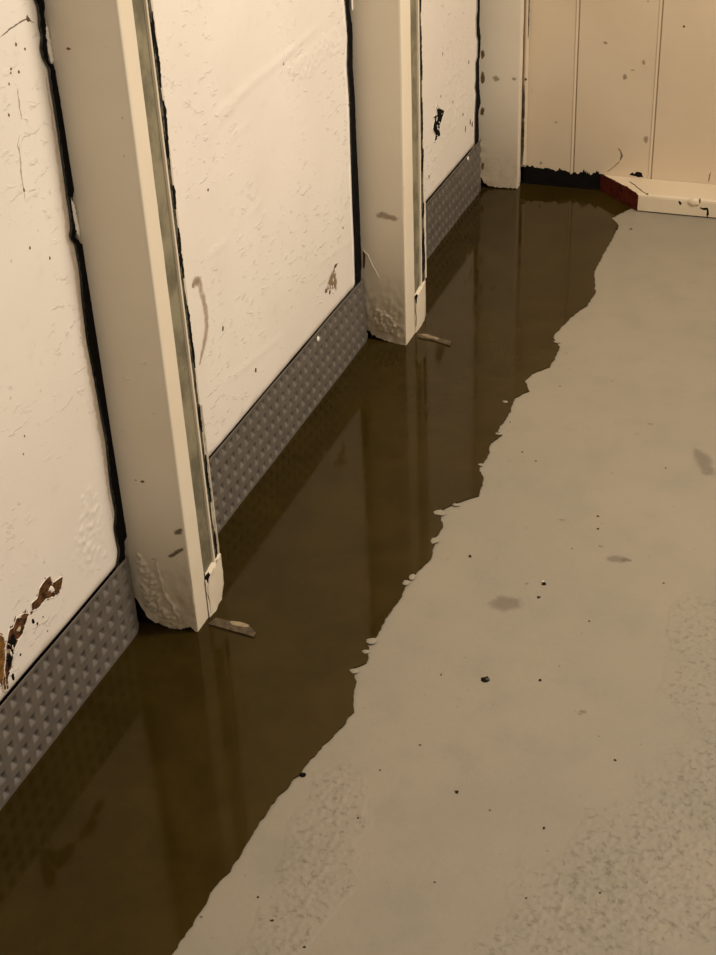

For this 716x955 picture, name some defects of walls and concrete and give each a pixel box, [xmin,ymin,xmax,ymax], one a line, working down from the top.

peeling [419,0,445,282]
leakage [192,278,208,363]
flaking render [325,263,338,294]
peeling [0,575,63,692]